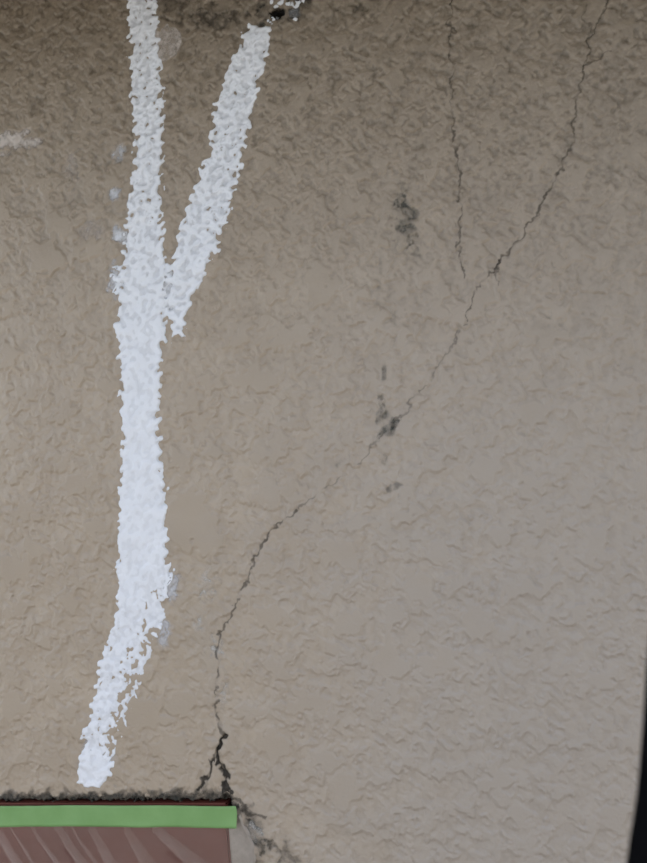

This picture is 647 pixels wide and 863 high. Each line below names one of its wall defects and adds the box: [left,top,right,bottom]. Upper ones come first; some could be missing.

crack [197,734,241,801]